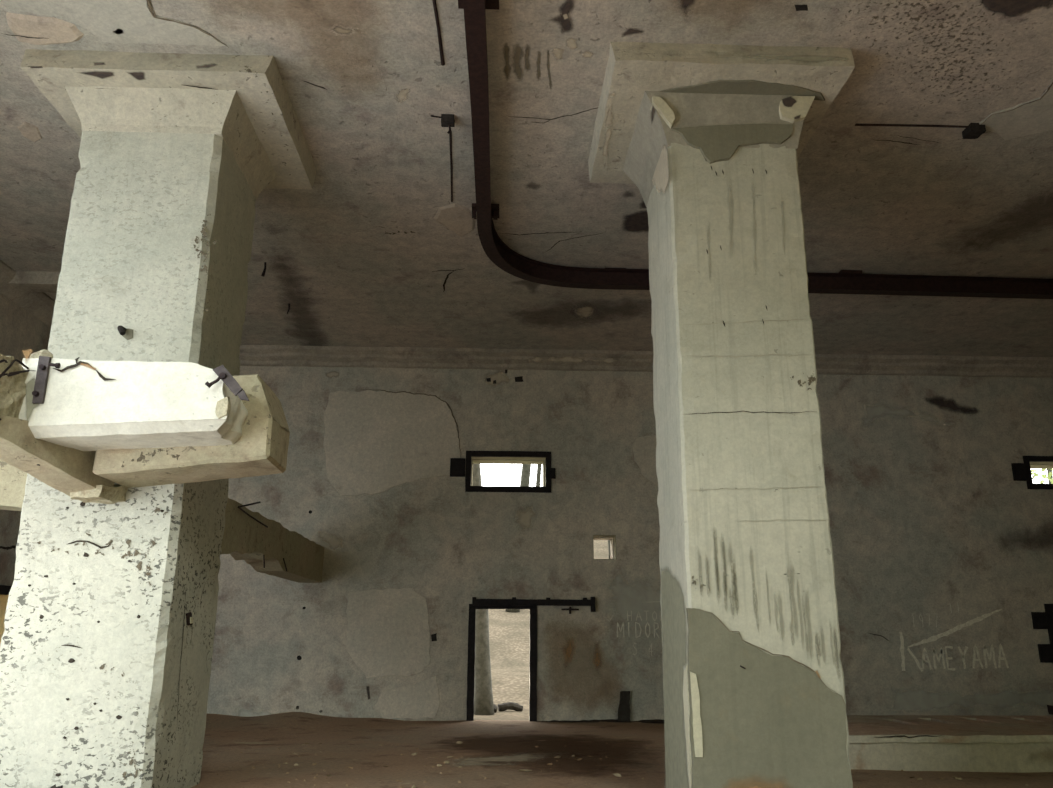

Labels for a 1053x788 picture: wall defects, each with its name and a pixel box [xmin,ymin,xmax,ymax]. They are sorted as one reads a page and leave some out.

damp [504,0,591,88]
spalling [849,0,1051,104]
flaking render [650,80,825,164]
spalling [652,147,669,192]
spalling [194,215,217,290]
spalling [0,359,29,378]
spalling [215,397,231,419]
crack [694,408,814,416]
spalling [121,448,180,467]
flaking render [661,569,853,788]
damp [439,735,642,776]